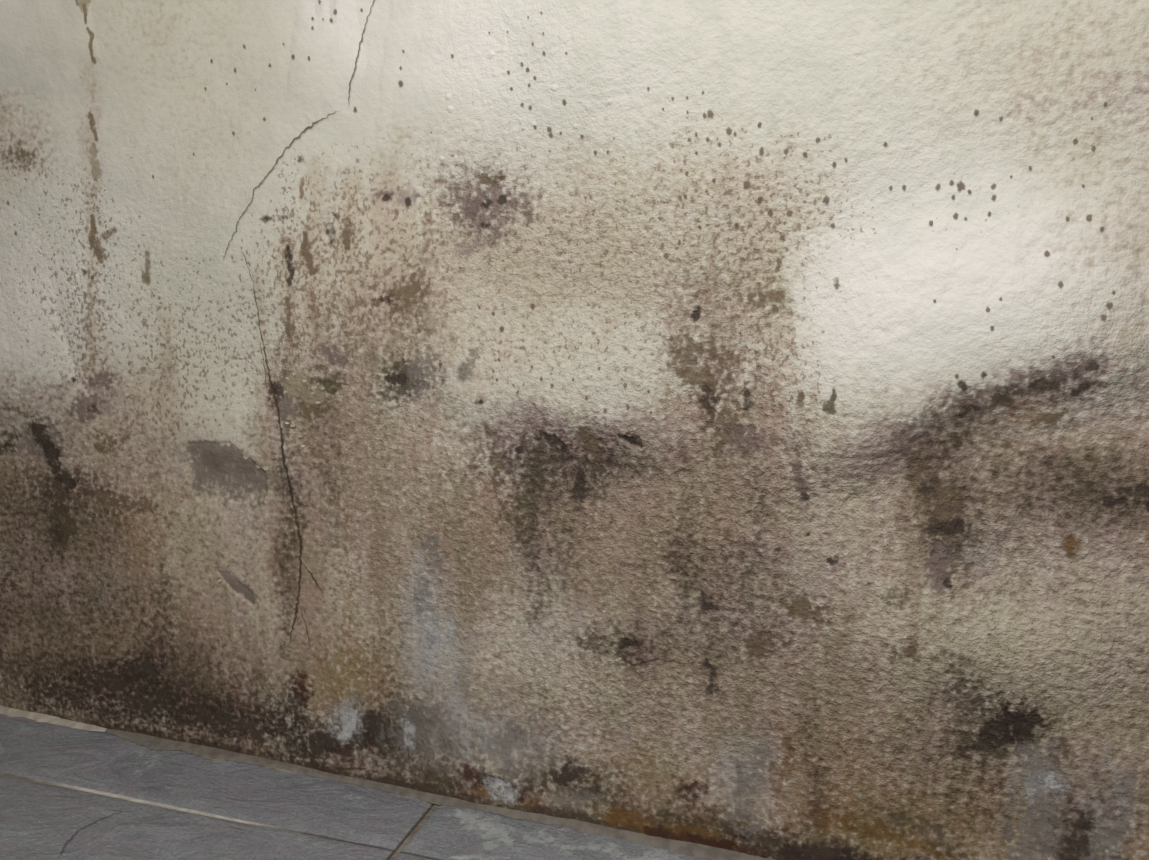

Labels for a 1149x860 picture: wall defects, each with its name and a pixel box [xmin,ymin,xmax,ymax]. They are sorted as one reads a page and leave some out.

leakage [439,169,540,239]
leakage [284,232,316,334]
leakage [749,258,784,311]
crack [223,0,374,647]
leakage [384,361,420,396]
leakage [668,337,786,456]
leakage [823,388,836,414]
leakage [0,422,78,493]
leakage [892,355,1099,593]
leakage [28,653,416,775]
leakage [952,694,1039,757]
leakage [464,765,525,804]